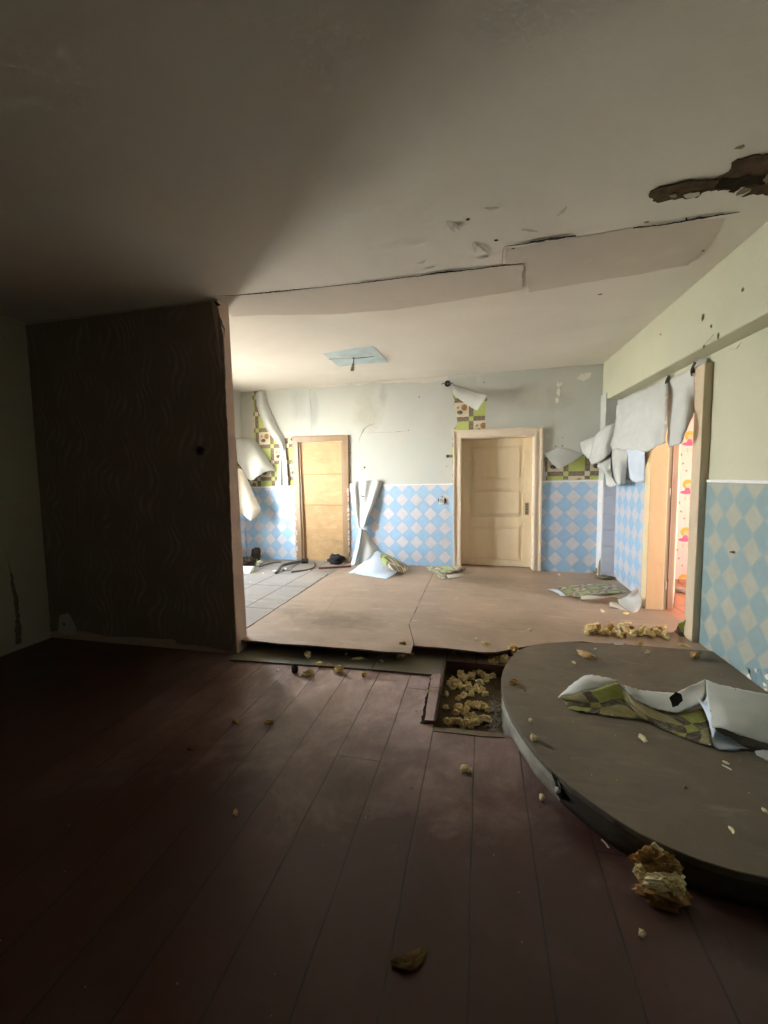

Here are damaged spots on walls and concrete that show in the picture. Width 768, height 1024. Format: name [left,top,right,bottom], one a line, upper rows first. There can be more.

flaking render [649,144,768,203]
crack [7,555,22,645]